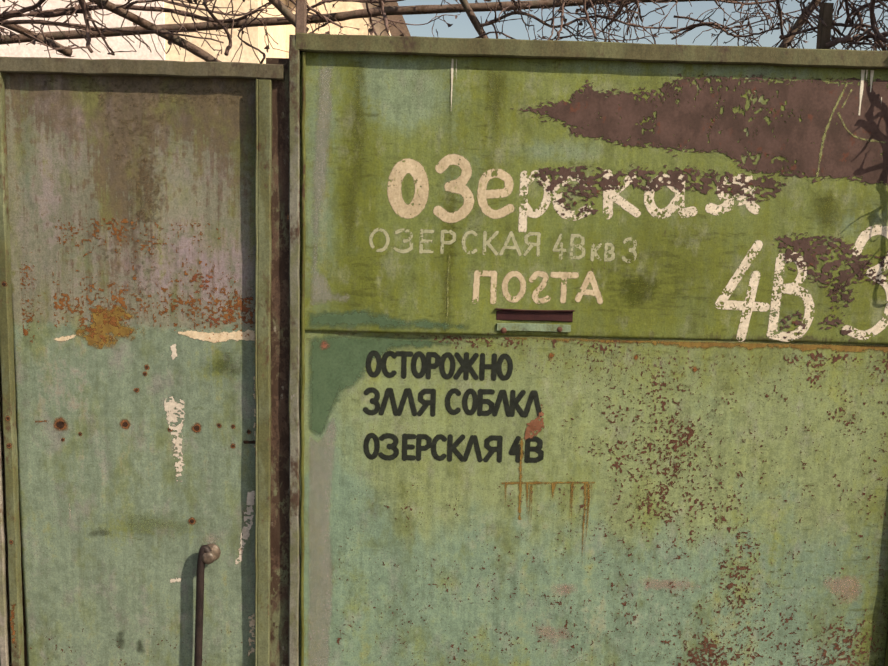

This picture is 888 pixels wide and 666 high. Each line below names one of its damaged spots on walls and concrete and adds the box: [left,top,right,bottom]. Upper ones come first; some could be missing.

peeling [510,73,888,218]
rust [76,306,135,349]
rust [190,274,216,294]
rust [202,296,255,328]
peeling [421,336,642,359]
rust [546,338,888,353]
peeling [772,232,888,341]
rust [35,417,67,441]
peeling [164,396,185,481]
peeling [235,491,255,564]
rust [502,404,595,550]
peeling [444,349,888,666]